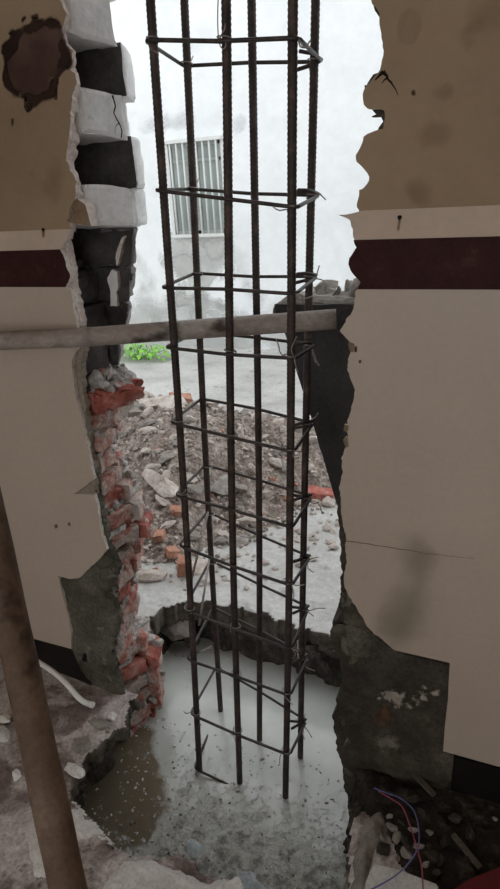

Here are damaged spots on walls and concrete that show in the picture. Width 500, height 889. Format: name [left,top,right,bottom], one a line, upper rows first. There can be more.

crack [375,70,398,95]
crack [111,95,123,138]
spalling [61,553,125,695]
spalling [335,589,450,794]
damp [378,685,439,709]